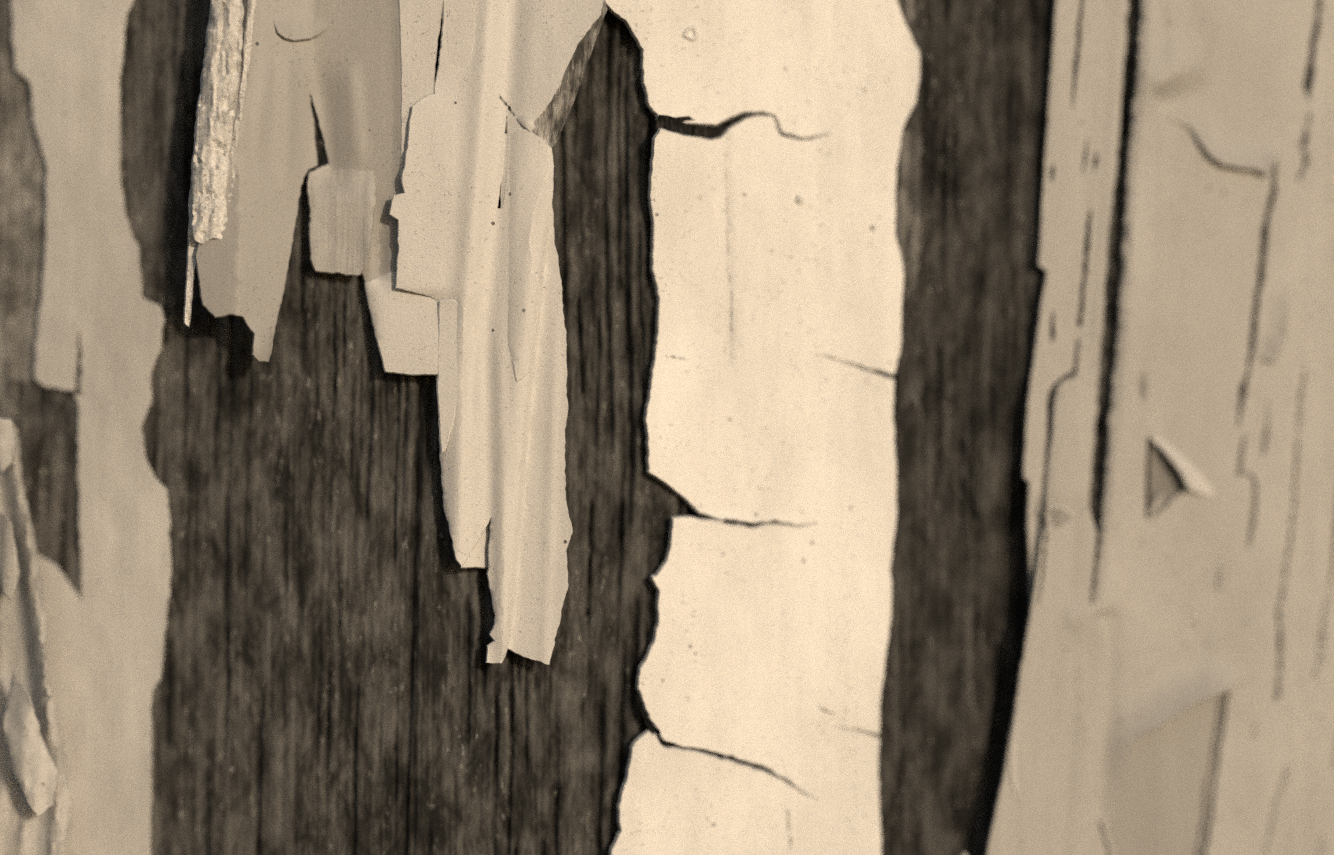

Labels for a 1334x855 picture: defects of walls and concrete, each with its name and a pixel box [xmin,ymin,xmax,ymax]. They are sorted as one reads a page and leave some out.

crack [656,113,815,140]
crack [1238,0,1320,408]
spalling [120,0,688,855]
spalling [854,0,1116,855]
crack [698,514,793,527]
peeling [1145,434,1216,517]
crack [636,693,793,786]